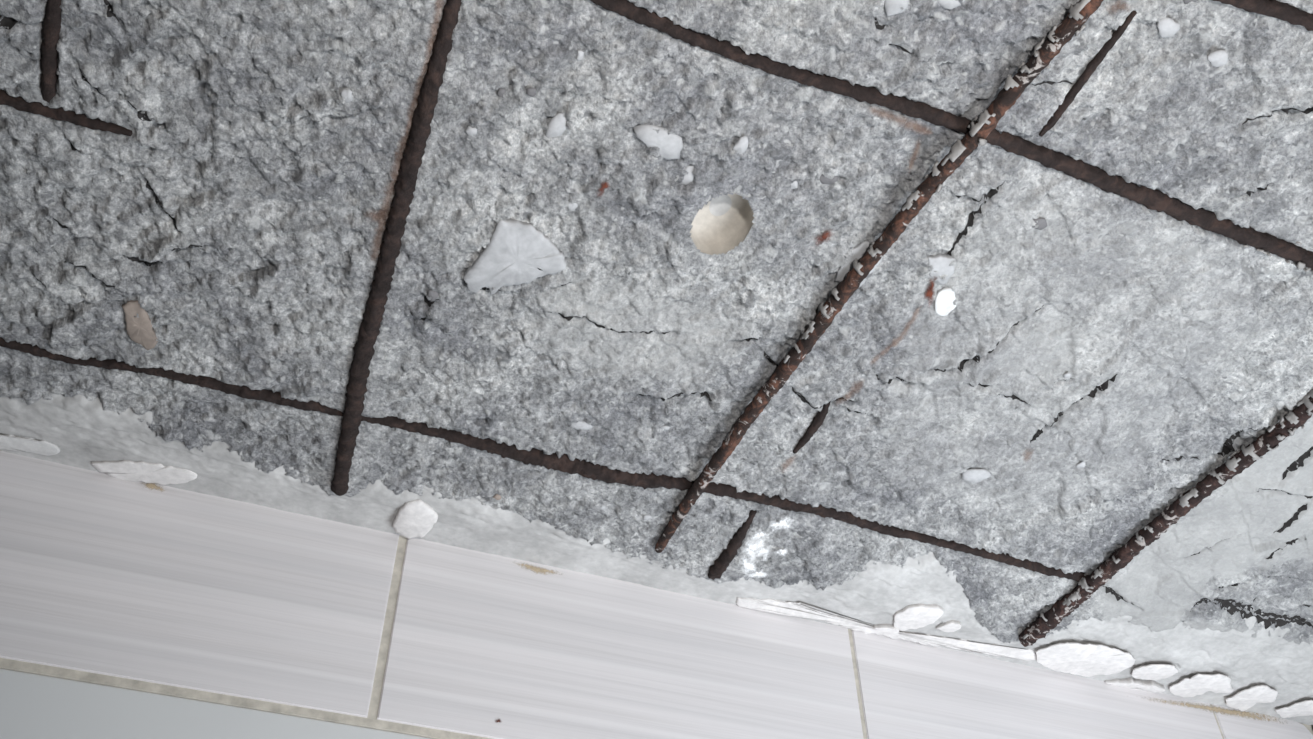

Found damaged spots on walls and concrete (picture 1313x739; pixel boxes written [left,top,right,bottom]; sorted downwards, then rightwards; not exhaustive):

crack [80,69,153,121]
crack [36,180,208,288]
spalling [0,0,462,496]
crack [947,184,1003,256]
spalling [344,0,1313,647]
crack [744,338,866,414]
crack [934,306,1117,443]
crack [1156,428,1258,464]
crack [1193,446,1313,629]
crack [1103,586,1134,605]
flaking render [1035,642,1278,711]
flaking render [1275,700,1313,718]